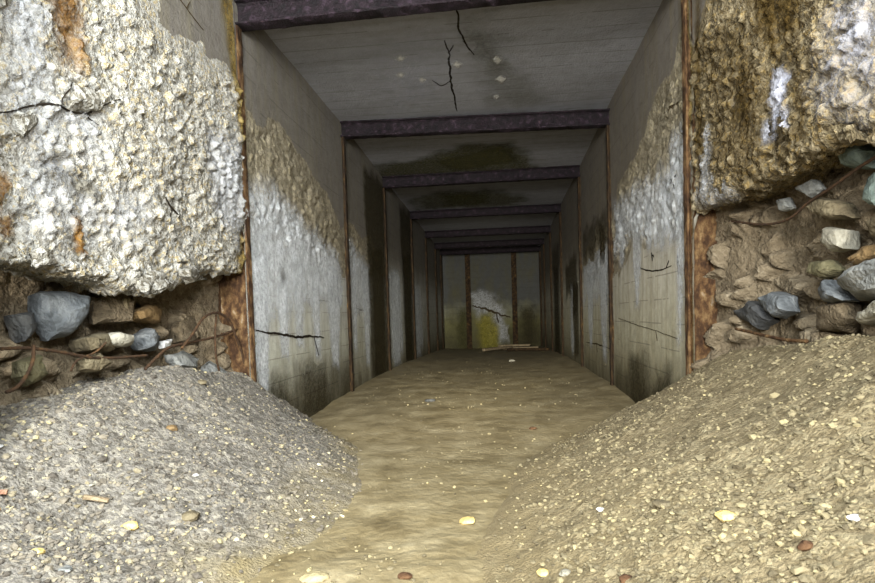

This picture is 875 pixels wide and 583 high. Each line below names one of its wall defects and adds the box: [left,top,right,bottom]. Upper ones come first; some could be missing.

crack [0,82,121,125]
spalling [0,0,246,298]
crack [256,330,324,355]
leakage [208,138,537,391]
crack [432,10,474,111]
crack [472,305,511,323]
leakage [553,133,684,355]
spalling [690,0,875,215]